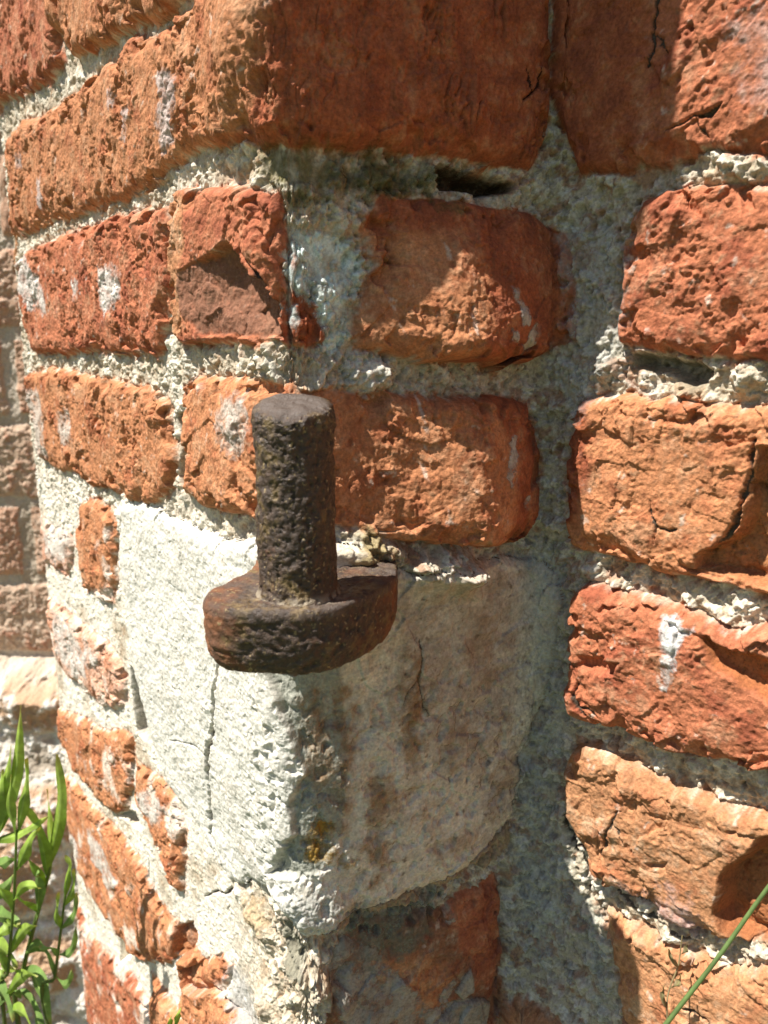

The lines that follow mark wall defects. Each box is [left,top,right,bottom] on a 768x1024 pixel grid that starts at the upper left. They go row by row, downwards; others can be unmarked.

crack [647,0,669,68]
crack [522,67,542,100]
crack [404,641,428,713]